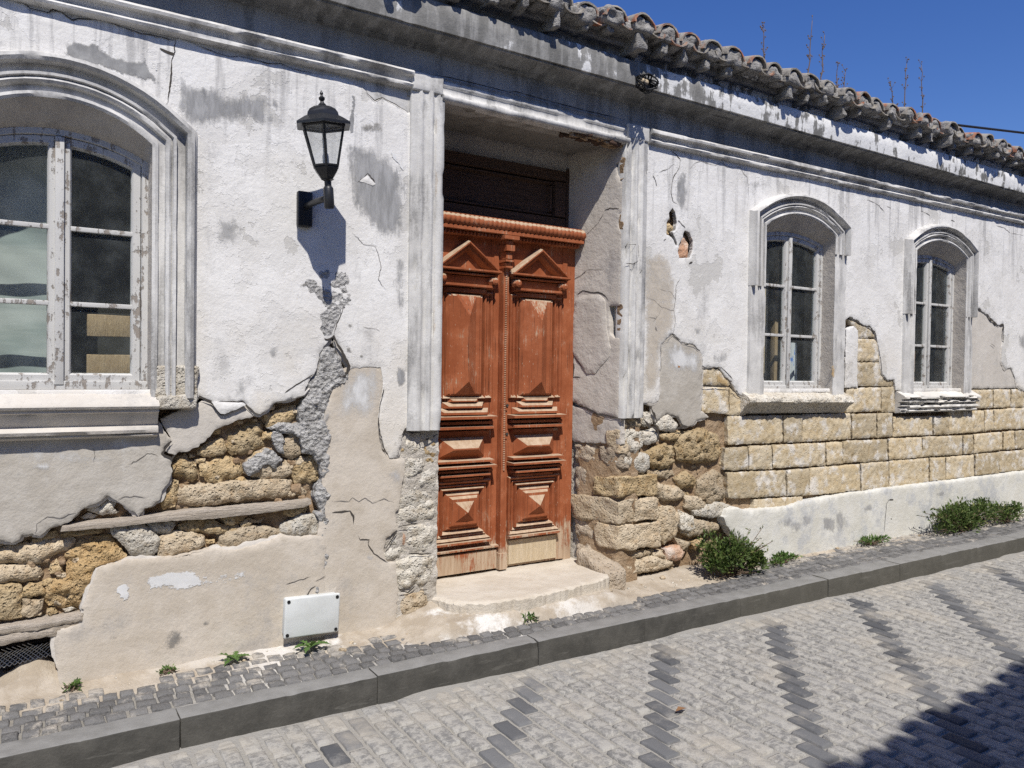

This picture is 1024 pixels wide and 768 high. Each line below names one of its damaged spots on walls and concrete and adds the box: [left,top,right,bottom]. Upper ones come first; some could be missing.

crack [18,1,311,108]
damp [180,85,277,122]
spalling [666,218,688,258]
spalling [571,319,1024,574]
spalling [0,403,319,620]
crack [332,497,432,562]